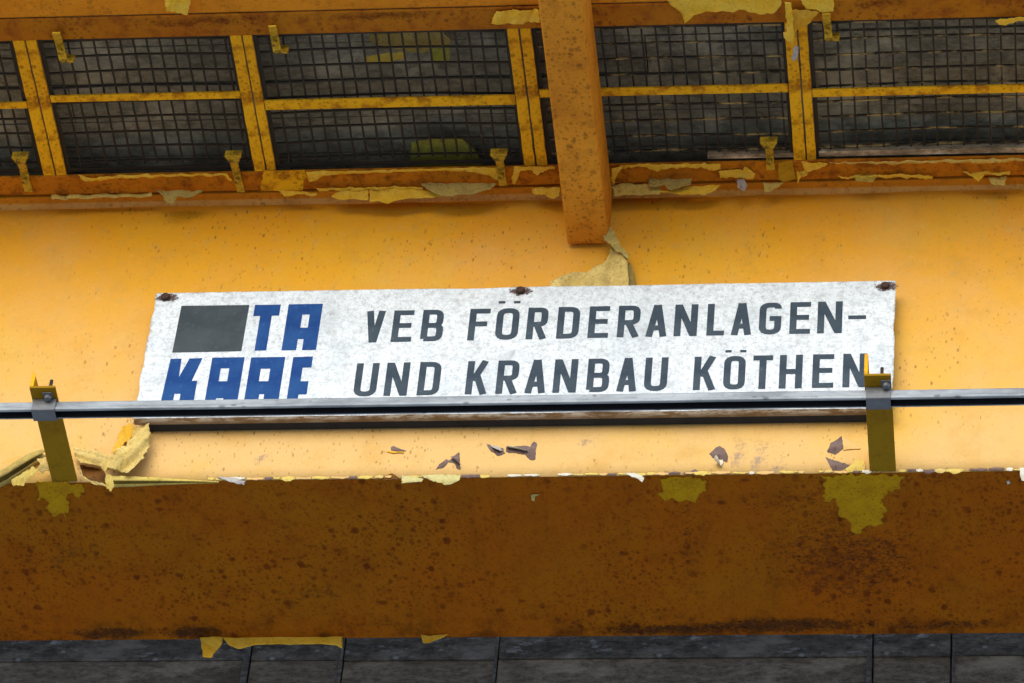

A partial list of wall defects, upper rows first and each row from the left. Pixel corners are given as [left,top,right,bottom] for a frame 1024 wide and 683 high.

peeling [668,0,834,61]
peeling [331,182,497,204]
peeling [550,226,637,286]
peeling [0,449,49,487]
peeling [74,423,490,492]
peeling [487,442,537,460]
peeling [558,446,804,483]
peeling [819,436,881,474]
peeling [898,467,1024,485]
corrosion [72,627,221,639]
peeling [200,636,343,658]
corrosion [609,618,872,635]